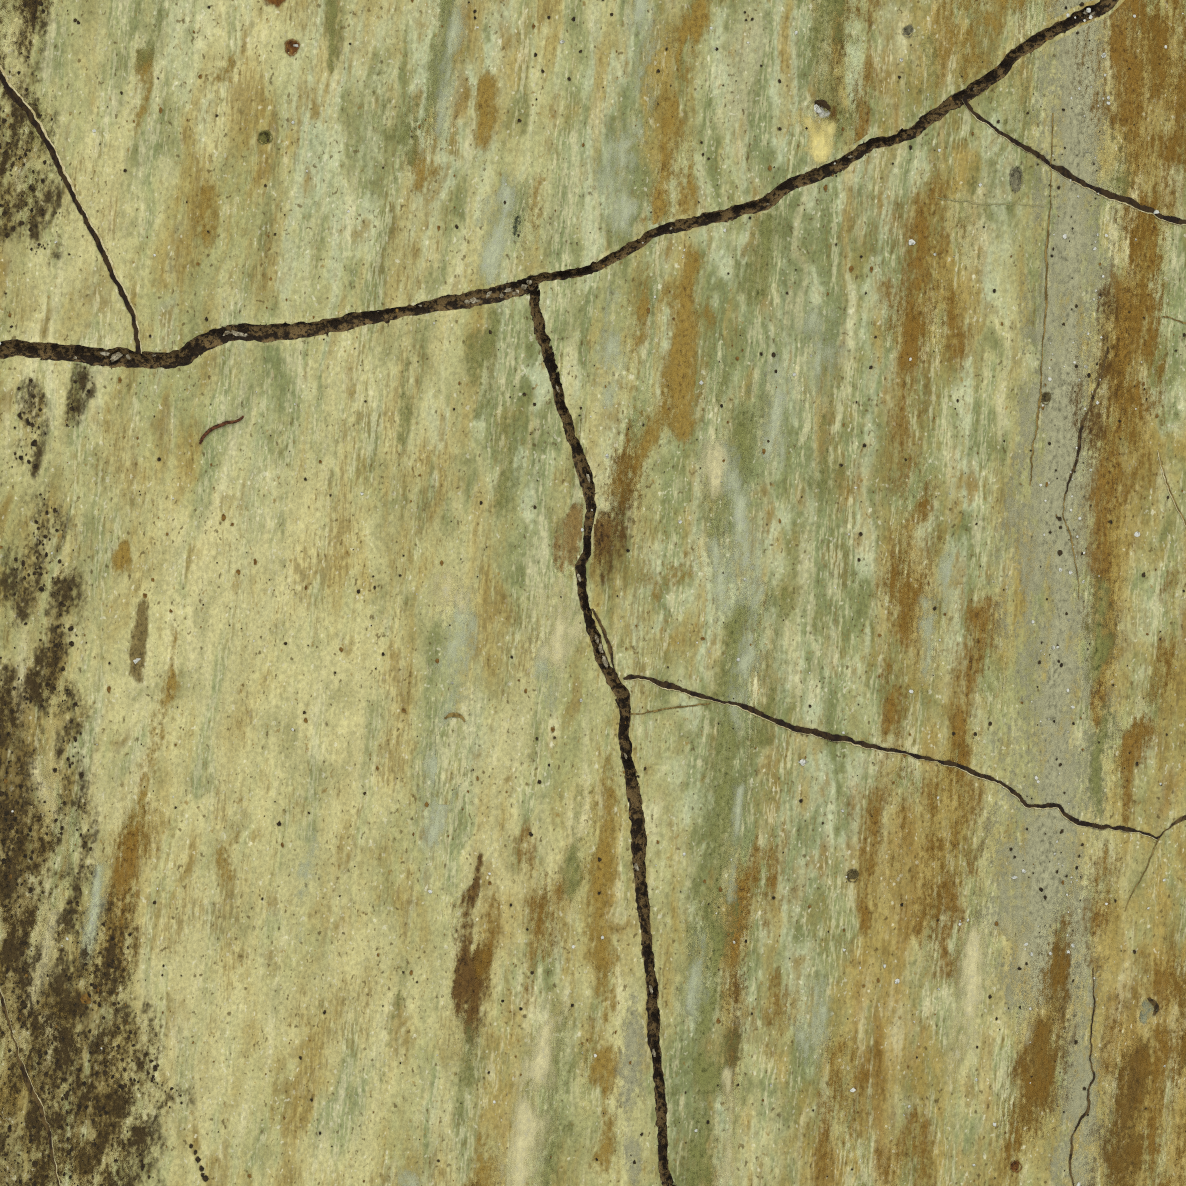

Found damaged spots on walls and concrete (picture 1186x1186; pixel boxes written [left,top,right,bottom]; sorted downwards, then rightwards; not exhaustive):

mould [0,0,71,264]
mould [12,378,48,478]
mould [65,364,95,428]
crack [0,0,1186,612]
rust [885,175,969,494]
rust [1075,0,1186,730]
mould [0,491,192,1186]
crack [528,283,1186,1186]
rust [901,597,994,986]
crack [0,989,61,1186]
rust [1005,915,1076,1177]
rust [1103,941,1186,1186]